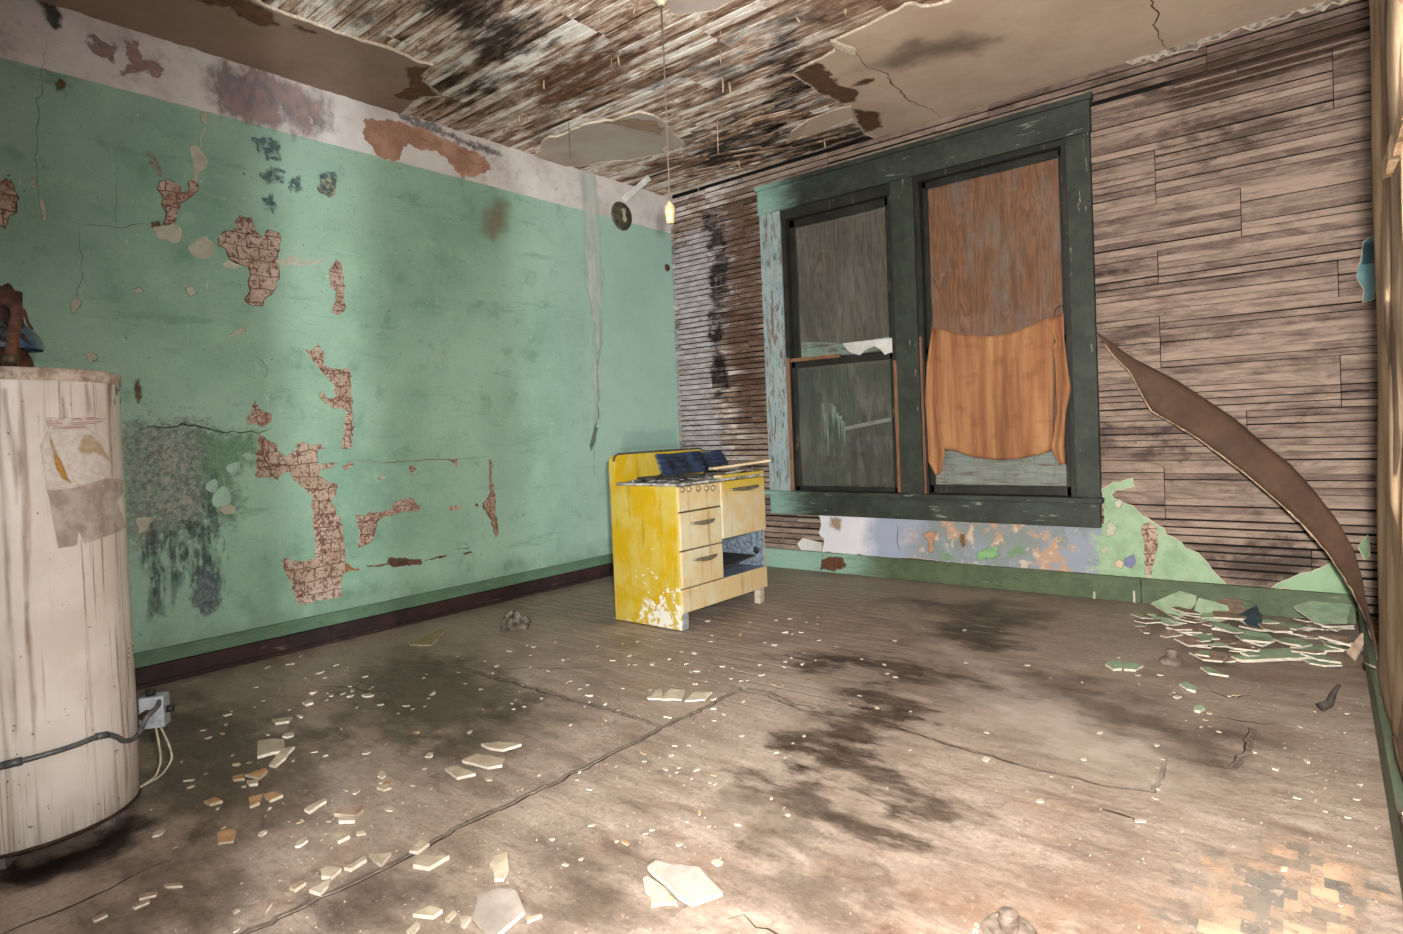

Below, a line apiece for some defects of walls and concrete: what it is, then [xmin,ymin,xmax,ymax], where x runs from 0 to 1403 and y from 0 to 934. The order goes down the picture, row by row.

peeling [88,34,164,78]
peeling [200,61,324,134]
peeling [362,117,491,179]
crack [1148,0,1167,50]
peeling [145,145,346,315]
water stain [122,419,256,616]
peeling [247,344,472,605]
water stain [912,600,1037,652]
water stain [145,714,323,810]
water stain [359,659,531,763]
crack [239,663,1283,934]
water stain [749,654,994,849]